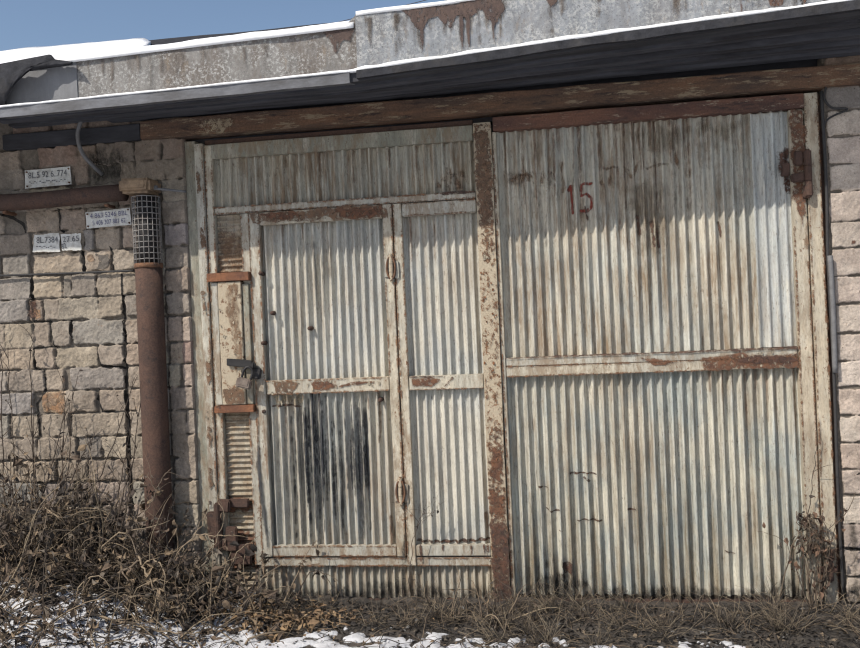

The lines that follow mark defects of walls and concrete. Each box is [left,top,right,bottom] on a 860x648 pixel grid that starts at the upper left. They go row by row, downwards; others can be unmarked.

corrosion [402,0,505,50]
peeling [219,284,242,372]
corrosion [201,99,839,602]
peeling [223,387,245,405]
damp [279,393,371,542]